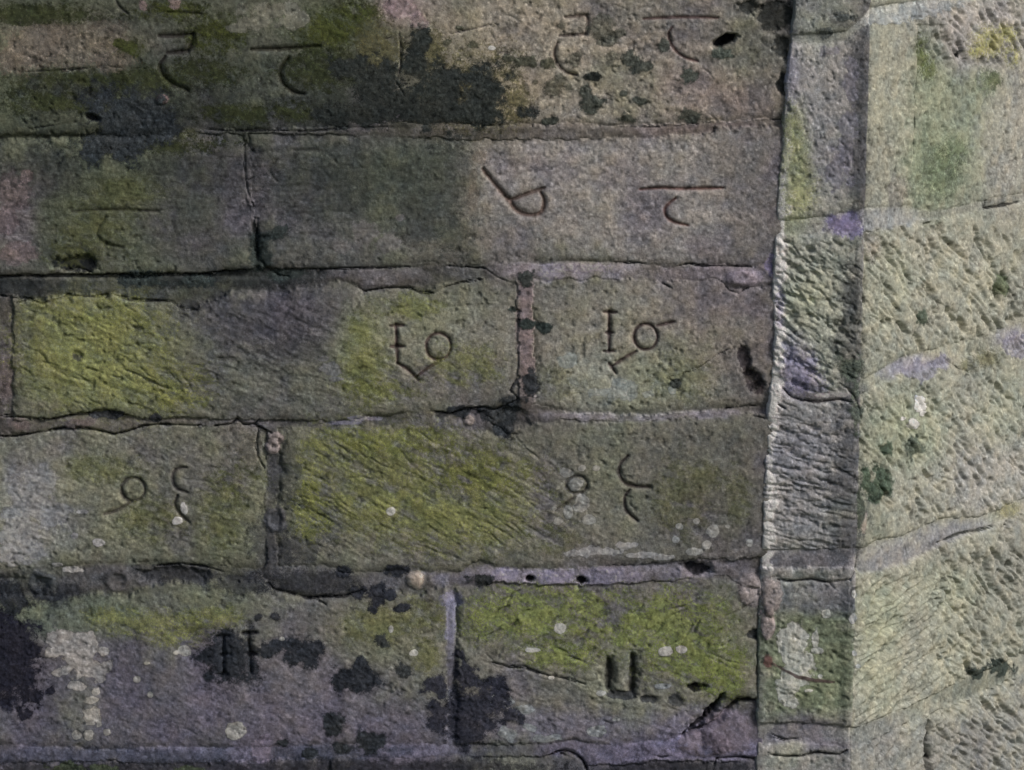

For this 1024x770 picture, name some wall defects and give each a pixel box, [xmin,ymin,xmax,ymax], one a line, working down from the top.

leakage [142,15,410,157]
spalling [737,345,765,394]
leakage [133,562,358,595]
crack [682,693,755,733]